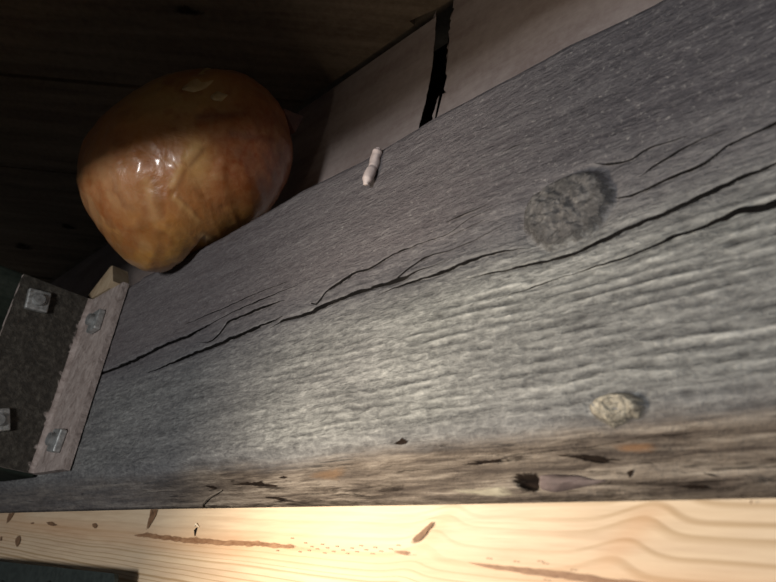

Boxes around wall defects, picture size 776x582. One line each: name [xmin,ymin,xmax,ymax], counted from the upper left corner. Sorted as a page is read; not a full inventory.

crack [596,122,776,198]
crack [101,163,776,374]